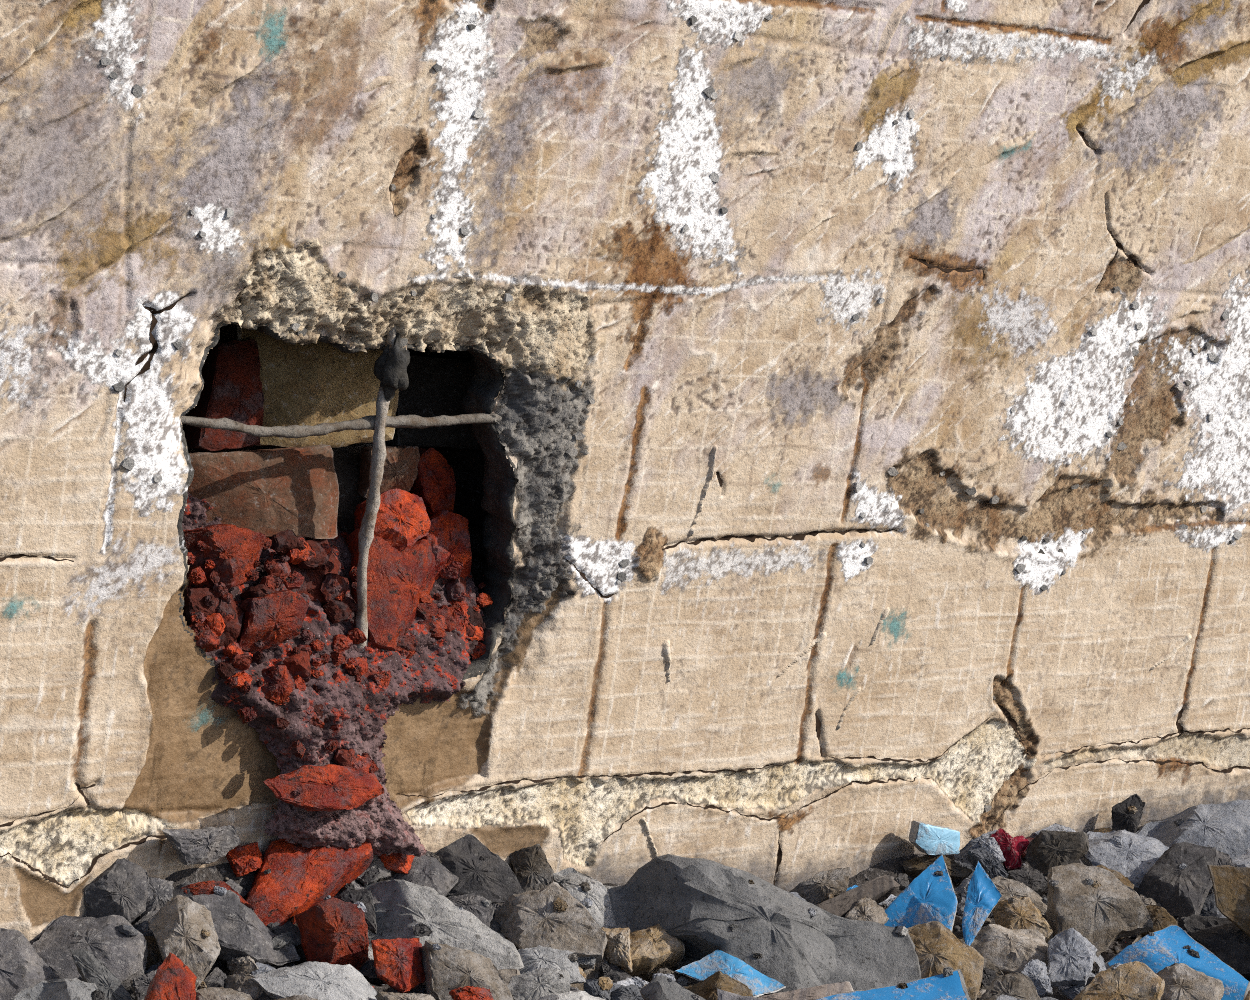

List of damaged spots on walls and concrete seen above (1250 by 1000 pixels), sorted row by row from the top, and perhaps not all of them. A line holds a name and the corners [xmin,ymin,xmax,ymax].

crack [1125,0,1150,31]
crack [1095,194,1149,290]
crack [124,293,190,402]
peeling [0,0,1250,717]
crack [0,554,74,562]
crack [564,558,616,598]
crack [0,782,166,888]
crack [397,700,1250,886]